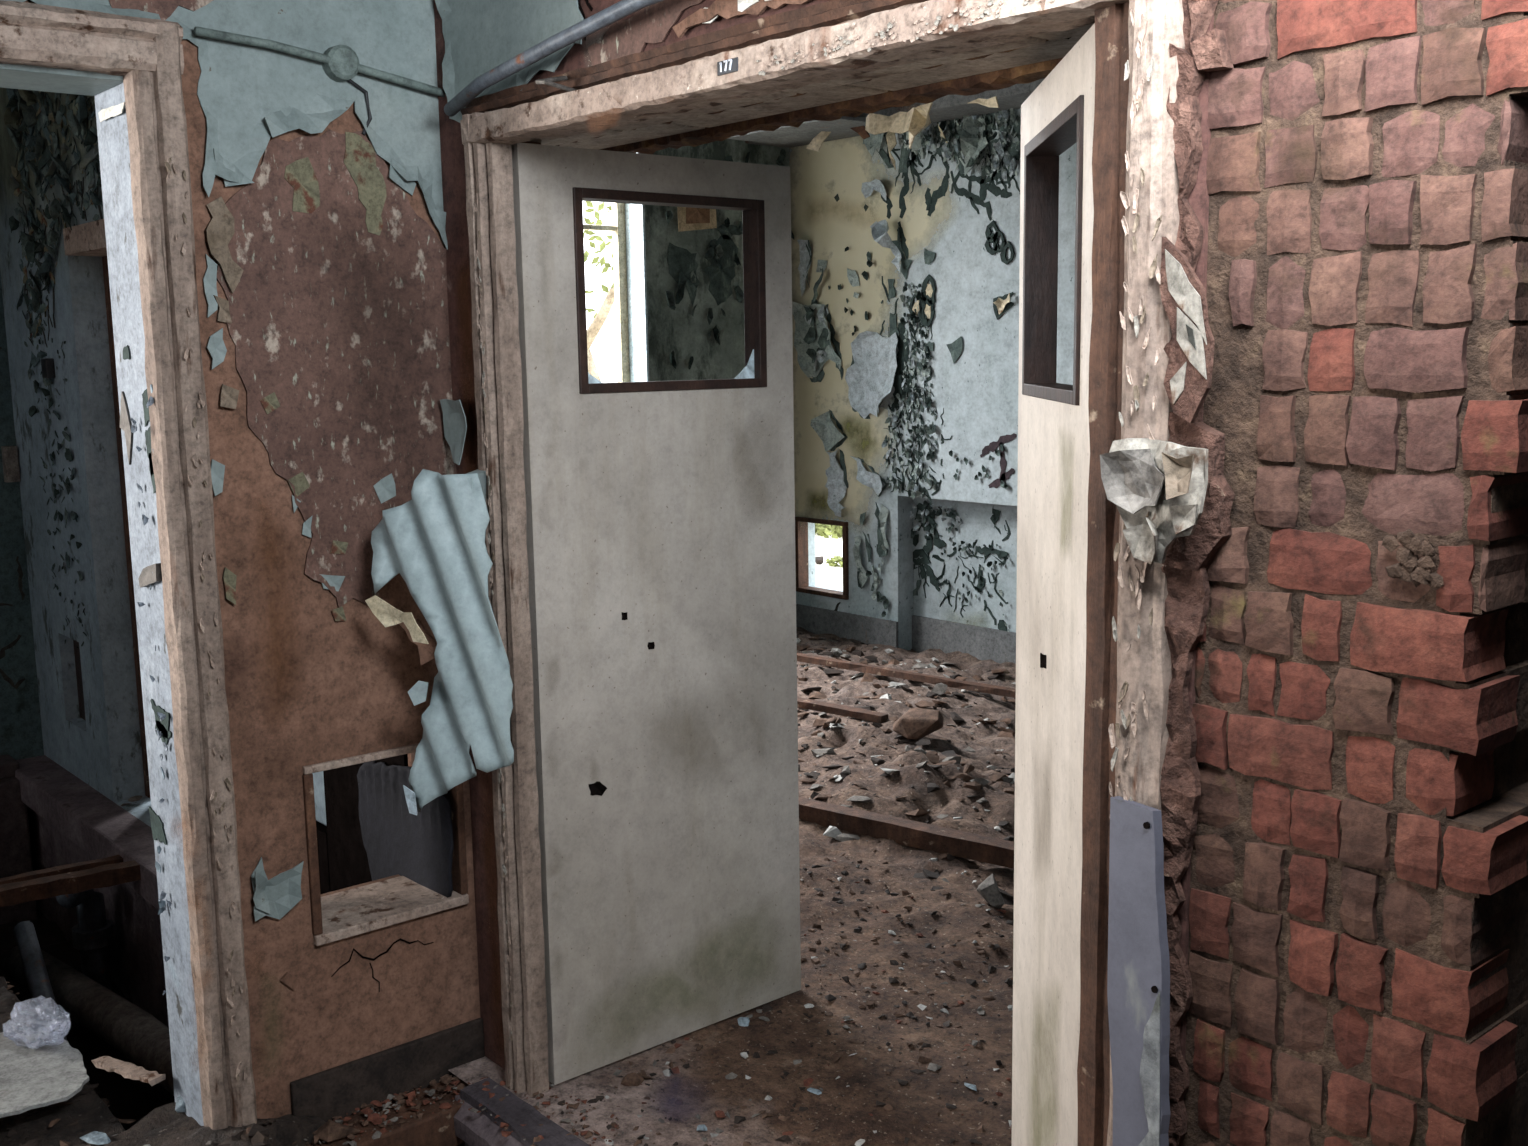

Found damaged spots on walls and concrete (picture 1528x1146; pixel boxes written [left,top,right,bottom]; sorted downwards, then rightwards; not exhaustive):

peeling [806,131,831,151]
peeling [851,96,1021,214]
spalling [3,0,811,649]
peeling [791,220,1011,632]
spalling [1100,0,1235,1146]
peeling [149,675,171,779]
peeling [149,798,167,873]
peeling [158,891,172,915]
crack [331,938,433,992]